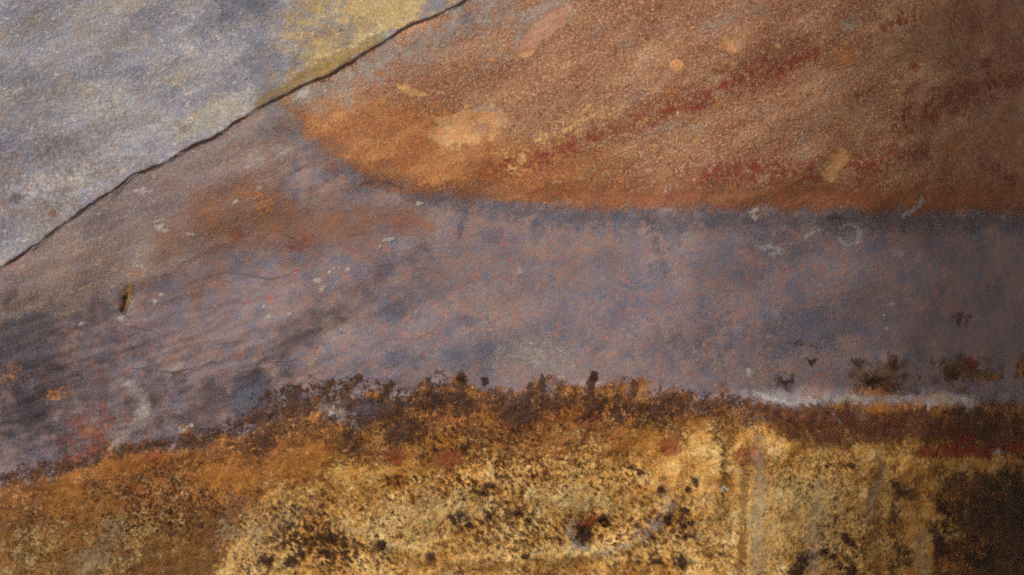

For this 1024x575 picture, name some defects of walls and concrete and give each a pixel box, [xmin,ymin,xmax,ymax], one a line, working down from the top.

crack [0,0,467,267]
corrosion [0,370,1024,575]